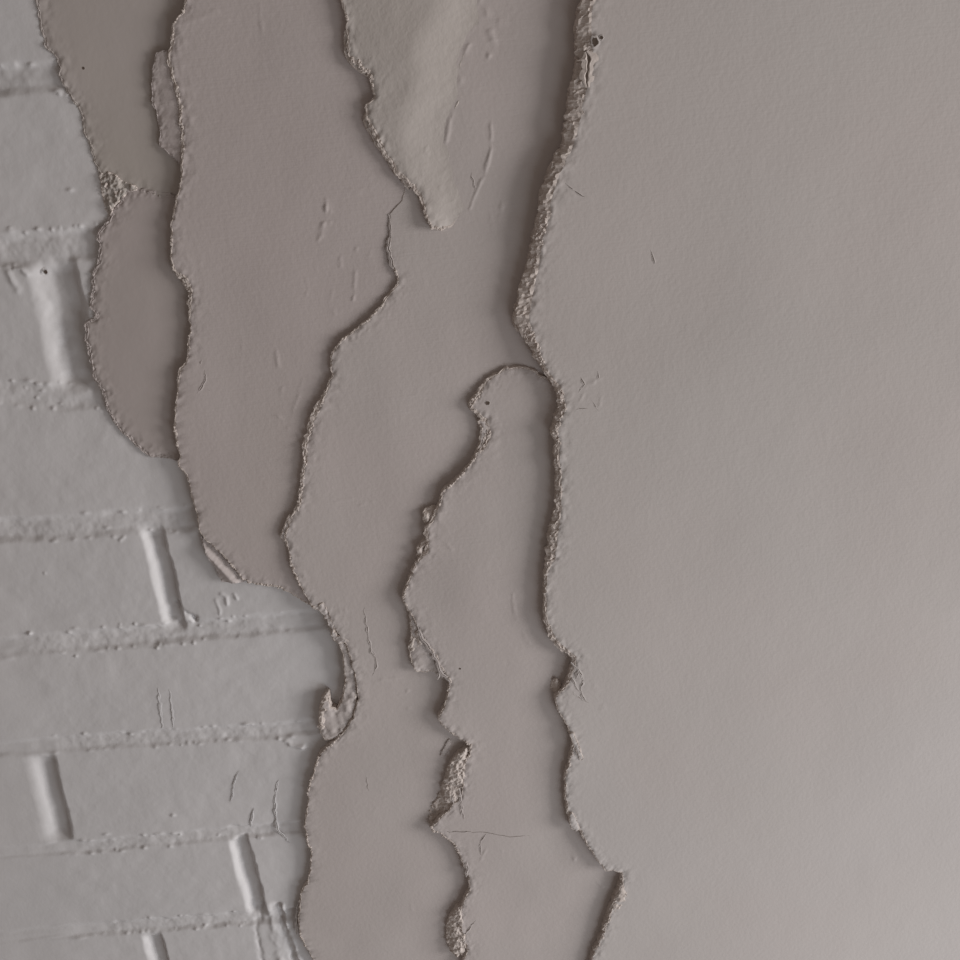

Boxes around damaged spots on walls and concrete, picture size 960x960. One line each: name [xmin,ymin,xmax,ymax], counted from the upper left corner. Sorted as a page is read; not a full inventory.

peeling [36,0,619,960]
peeling [512,0,960,960]